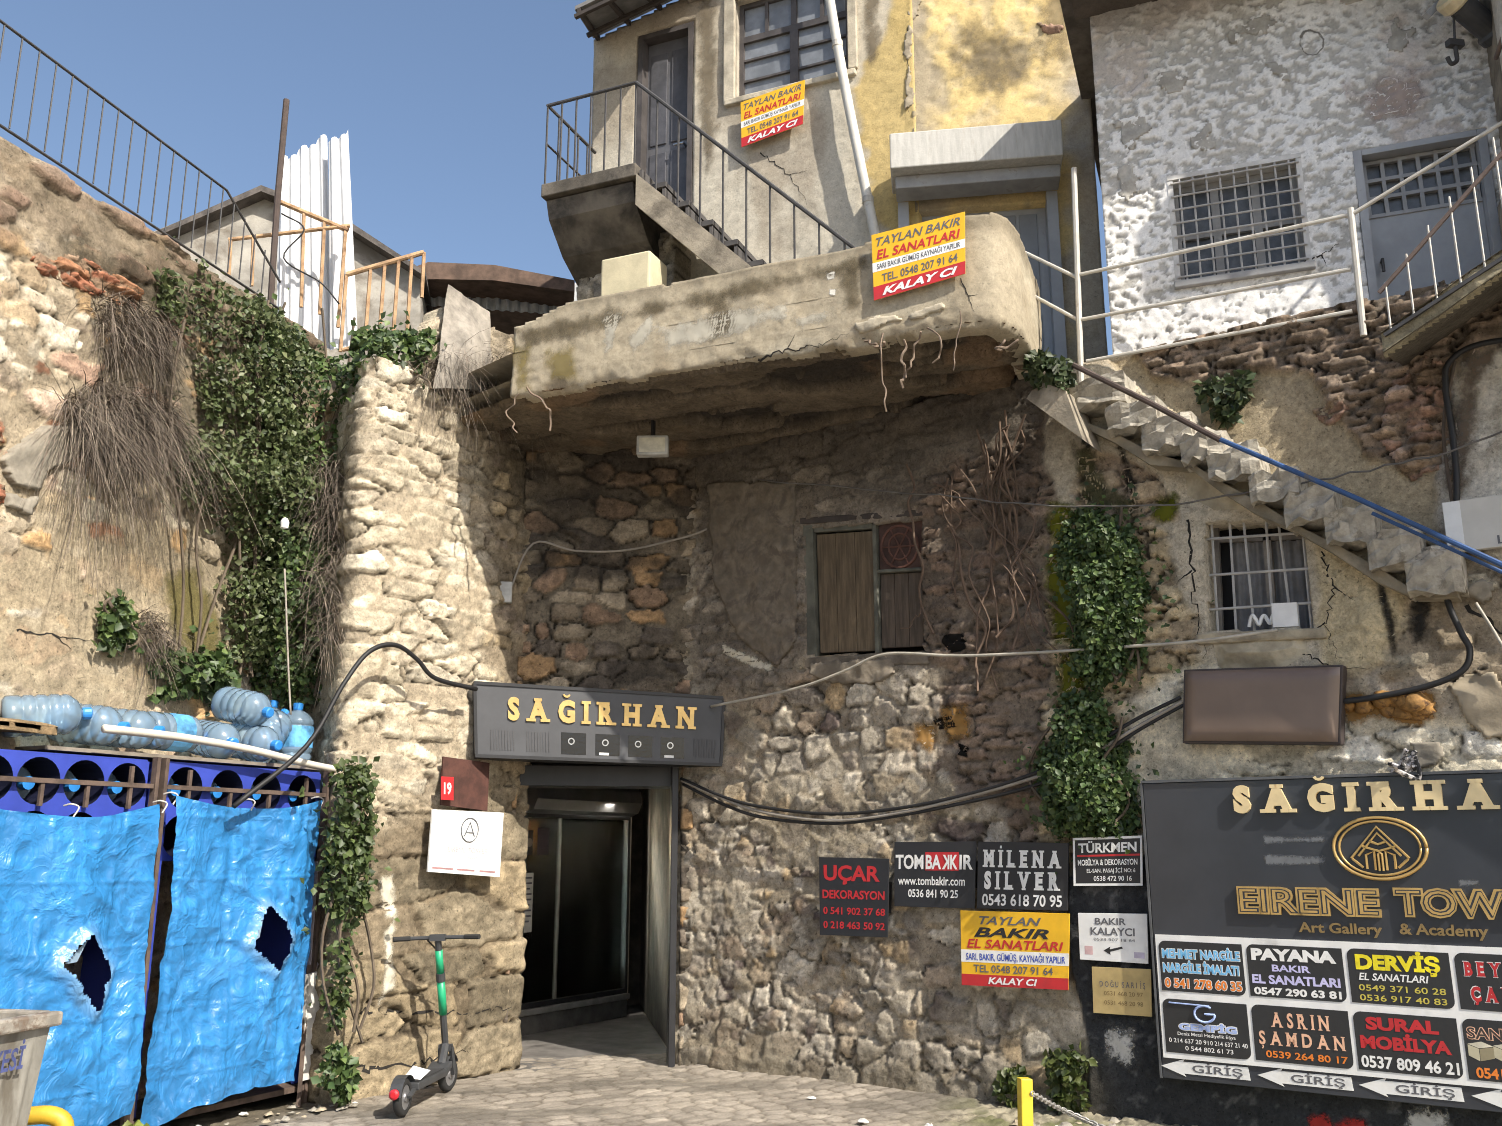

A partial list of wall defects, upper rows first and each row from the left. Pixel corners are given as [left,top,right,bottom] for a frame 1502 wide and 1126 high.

damp [952,30,1026,93]
damp [1042,0,1066,56]
spalling [1312,394,1349,426]
spalling [1370,355,1456,482]
crack [1178,519,1207,659]
peeling [1448,672,1502,739]